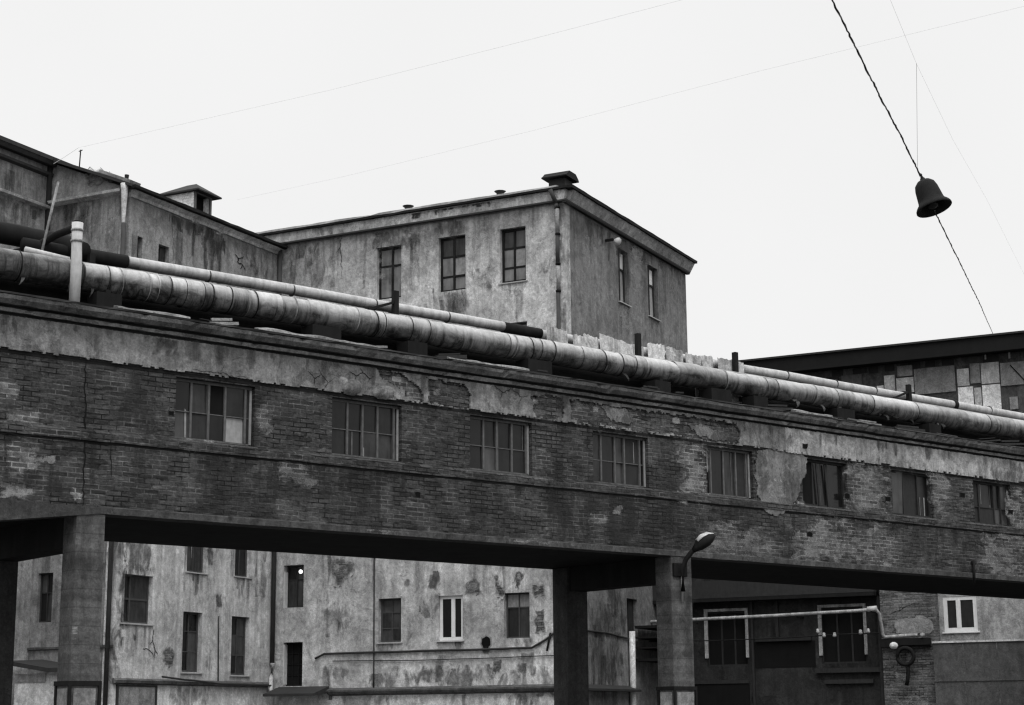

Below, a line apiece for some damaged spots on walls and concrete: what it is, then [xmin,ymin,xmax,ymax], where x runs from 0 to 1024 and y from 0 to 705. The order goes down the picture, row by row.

water stain [178,219,226,272]
crack [308,368,374,389]
spalling [378,371,423,403]
crack [2,366,113,505]
spalling [330,558,355,588]
spalling [494,572,546,600]
spalling [535,609,545,633]
water stain [406,666,472,686]